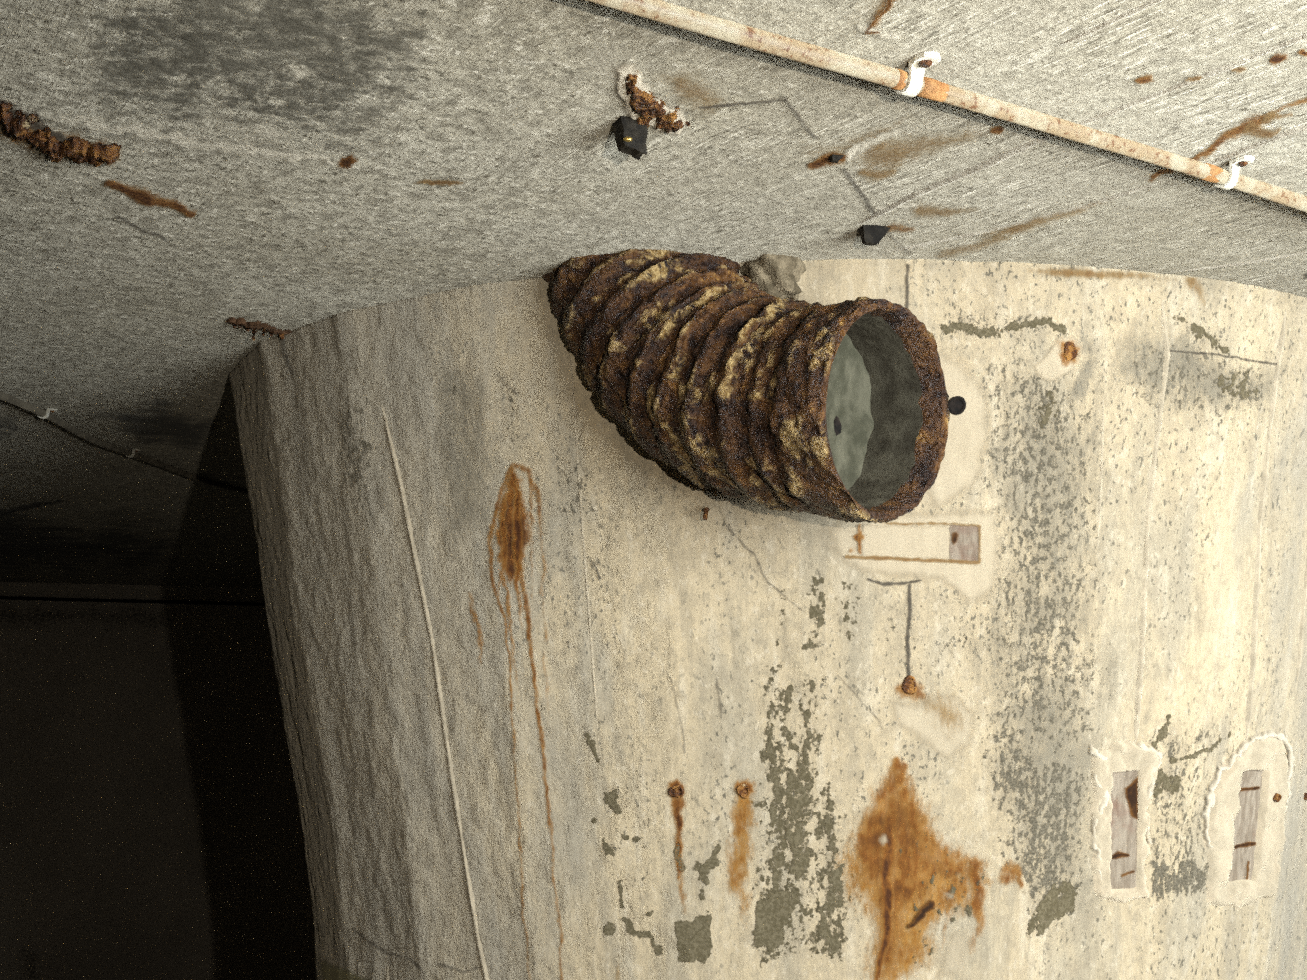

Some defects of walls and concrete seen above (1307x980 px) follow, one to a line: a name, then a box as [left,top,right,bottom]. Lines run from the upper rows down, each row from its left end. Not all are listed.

rust [0,99,196,218]
damp [38,0,423,165]
crack [866,0,892,34]
rust [1191,98,1307,183]
rust [1270,49,1307,64]
rust [226,317,292,341]
rust [488,464,554,855]
rust [669,780,684,899]
rust [729,781,753,906]
peeling [751,665,852,968]
rust [847,757,1023,980]